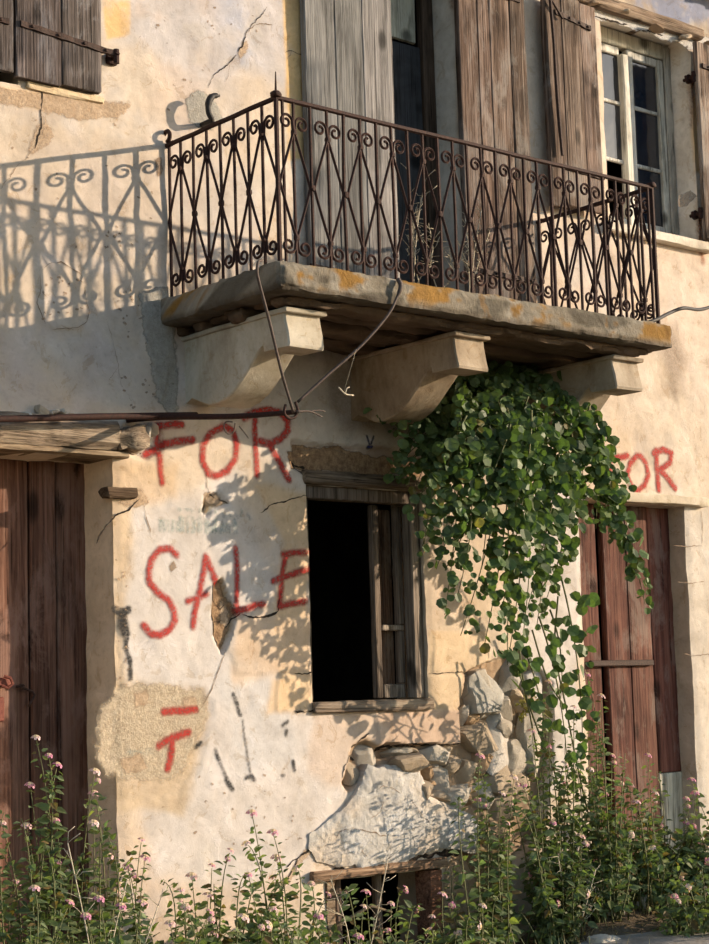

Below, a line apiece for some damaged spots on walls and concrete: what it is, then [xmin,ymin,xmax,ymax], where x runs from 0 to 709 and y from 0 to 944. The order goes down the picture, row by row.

crack [208,7,271,87]
crack [2,92,53,187]
crack [96,487,151,544]
crack [261,465,306,513]
peeling [212,581,228,645]
crack [196,652,225,716]